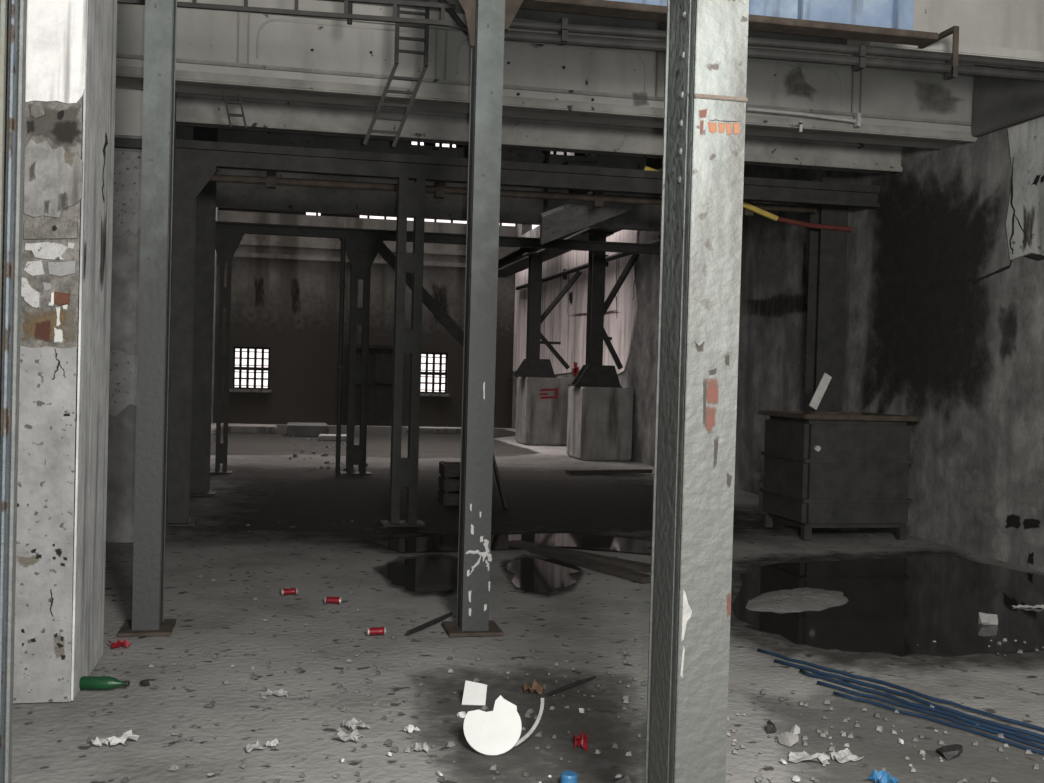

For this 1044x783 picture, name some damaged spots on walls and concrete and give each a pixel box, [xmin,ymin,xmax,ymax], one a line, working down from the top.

spalling [27,105,81,145]
damp [1023,208,1034,248]
flaking render [21,225,77,309]